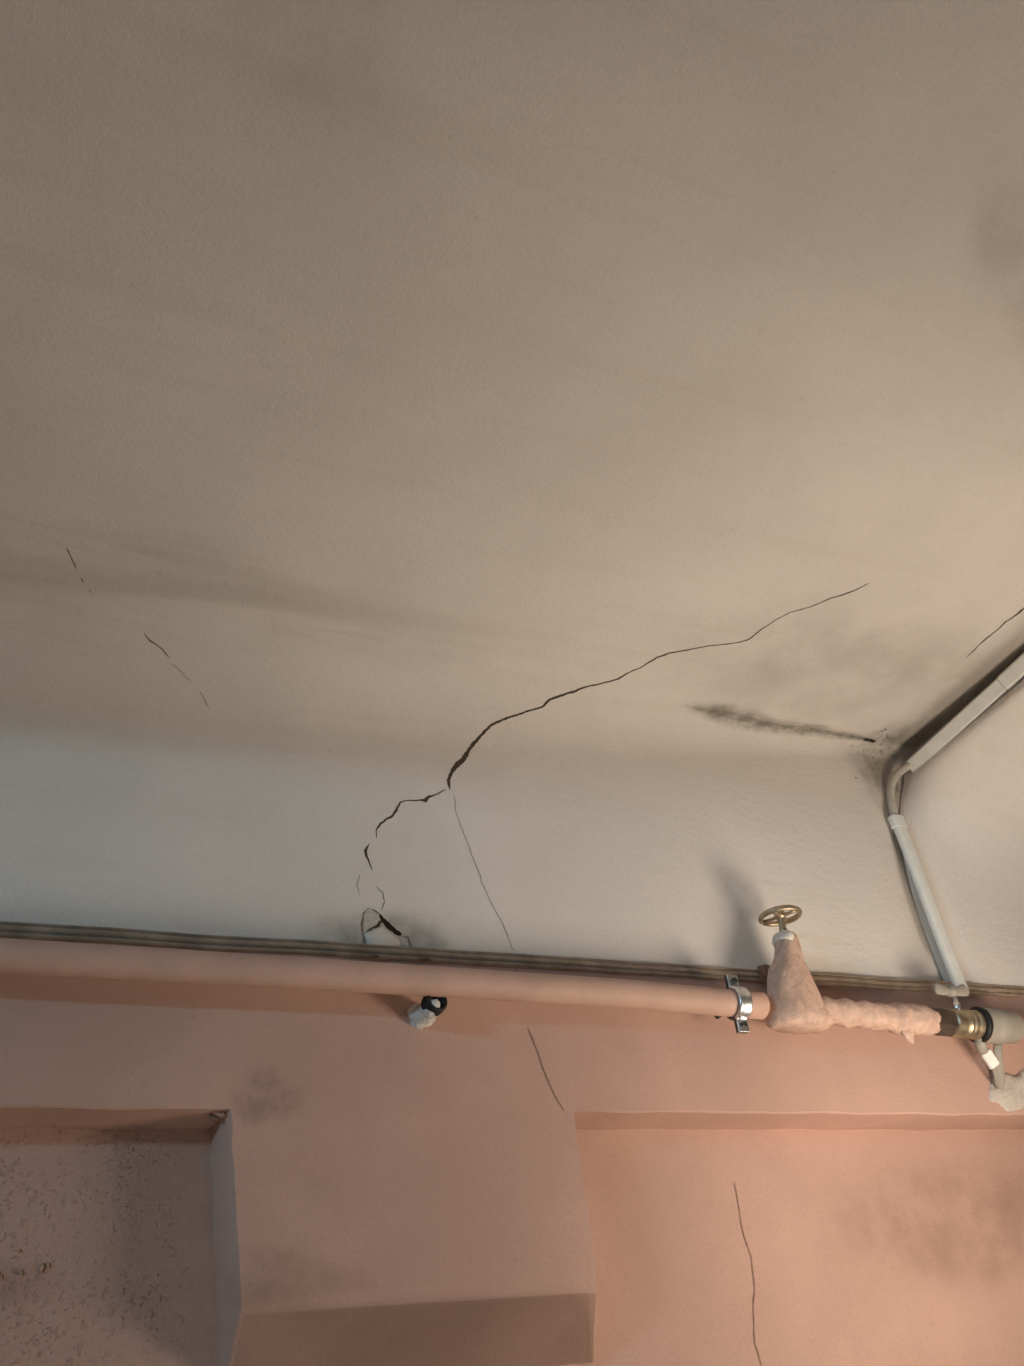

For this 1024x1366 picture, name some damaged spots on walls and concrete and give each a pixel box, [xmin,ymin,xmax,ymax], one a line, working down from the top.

crack [967,608,1024,657]
crack [356,583,869,972]
crack [528,1028,564,1111]